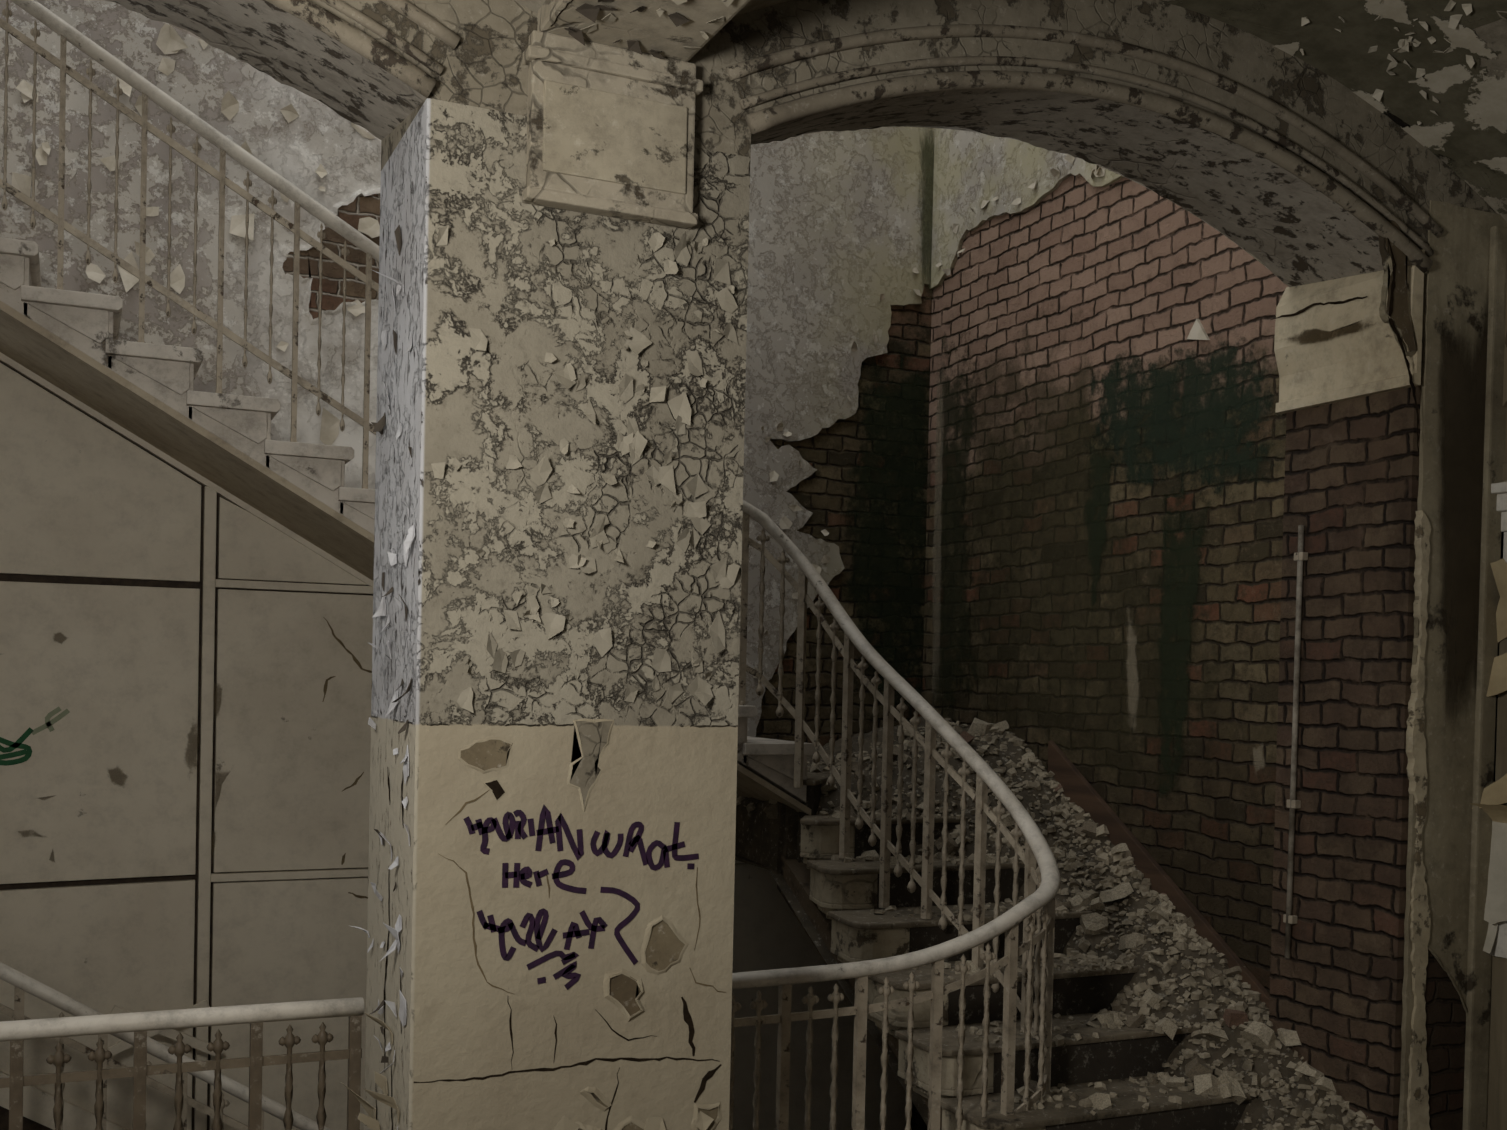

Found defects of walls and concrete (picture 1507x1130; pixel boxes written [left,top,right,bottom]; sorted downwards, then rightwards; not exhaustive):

peeling [86,241,155,292]
flaking render [277,164,404,325]
peeling [648,230,738,344]
peeling [544,327,711,552]
crack [322,617,372,702]
peeling [367,499,415,659]
peeling [486,583,573,673]
crack [342,767,404,828]
peeling [368,678,412,901]
peeling [567,718,614,812]
peeling [1406,510,1468,1130]
crack [341,790,726,1130]